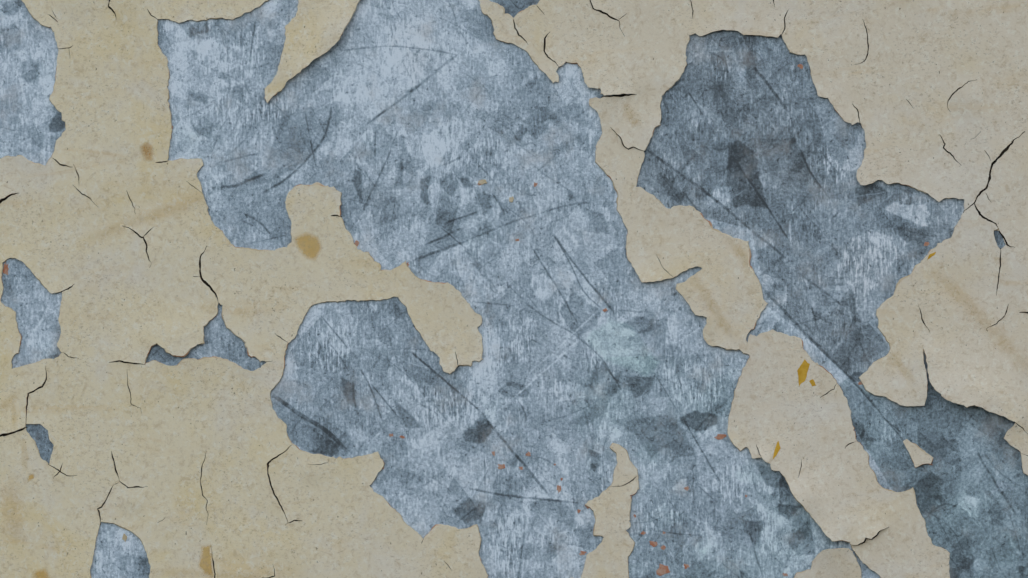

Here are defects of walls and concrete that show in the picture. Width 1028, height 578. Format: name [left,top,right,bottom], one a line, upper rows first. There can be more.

peeling [0,0,79,178]
peeling [1,258,79,369]
crack [123,192,150,261]
peeling [109,246,271,385]
peeling [147,0,892,578]
peeling [612,8,1028,578]
peeling [0,372,76,477]
peeling [90,454,152,578]